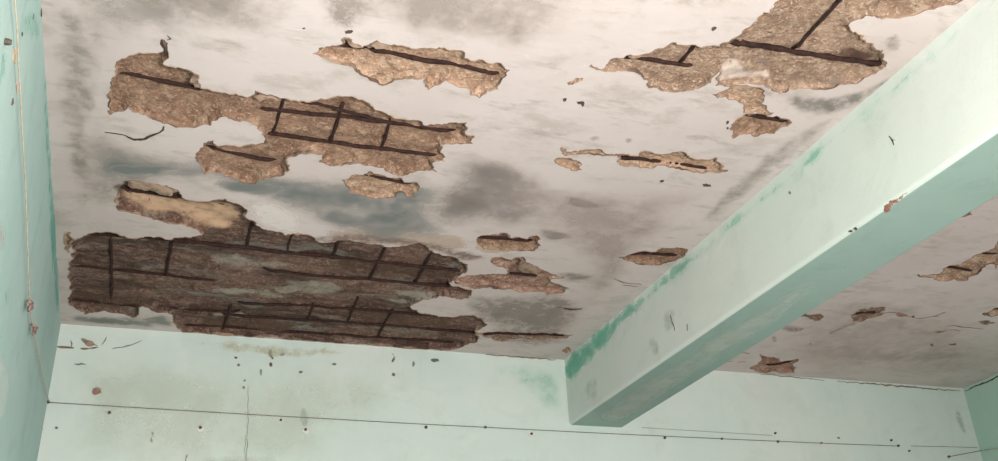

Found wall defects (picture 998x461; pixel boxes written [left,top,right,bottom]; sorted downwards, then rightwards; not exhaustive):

leakage [106,0,249,22]
spalling [589,0,963,139]
spalling [106,39,475,199]
spalling [554,147,728,187]
leakage [95,146,528,237]
leakage [50,180,59,303]
spalling [63,180,571,376]
leakage [545,231,566,239]
spalling [917,241,998,282]
leakage [75,316,170,326]
leakage [475,299,571,341]
spalling [750,354,799,373]